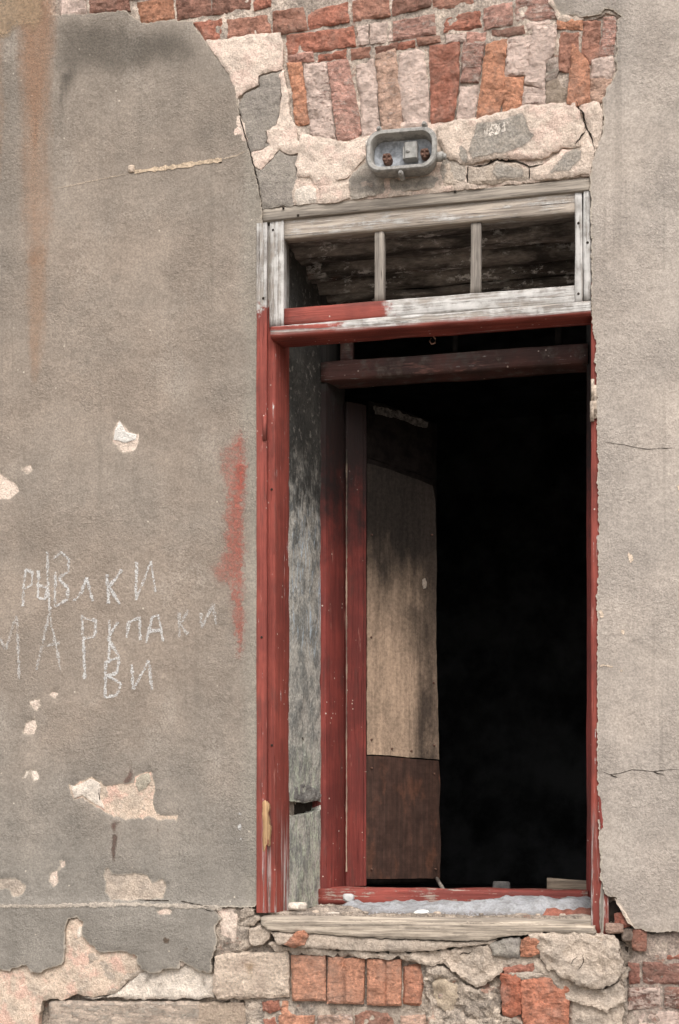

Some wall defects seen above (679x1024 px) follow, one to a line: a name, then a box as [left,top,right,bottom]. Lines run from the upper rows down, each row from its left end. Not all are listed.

spalling [46,0,621,210]
crack [575,101,595,149]
crack [466,158,542,183]
spalling [113,419,139,452]
spalling [0,473,19,499]
peeling [69,772,178,820]
crack [604,769,677,777]
spalling [0,850,679,1024]